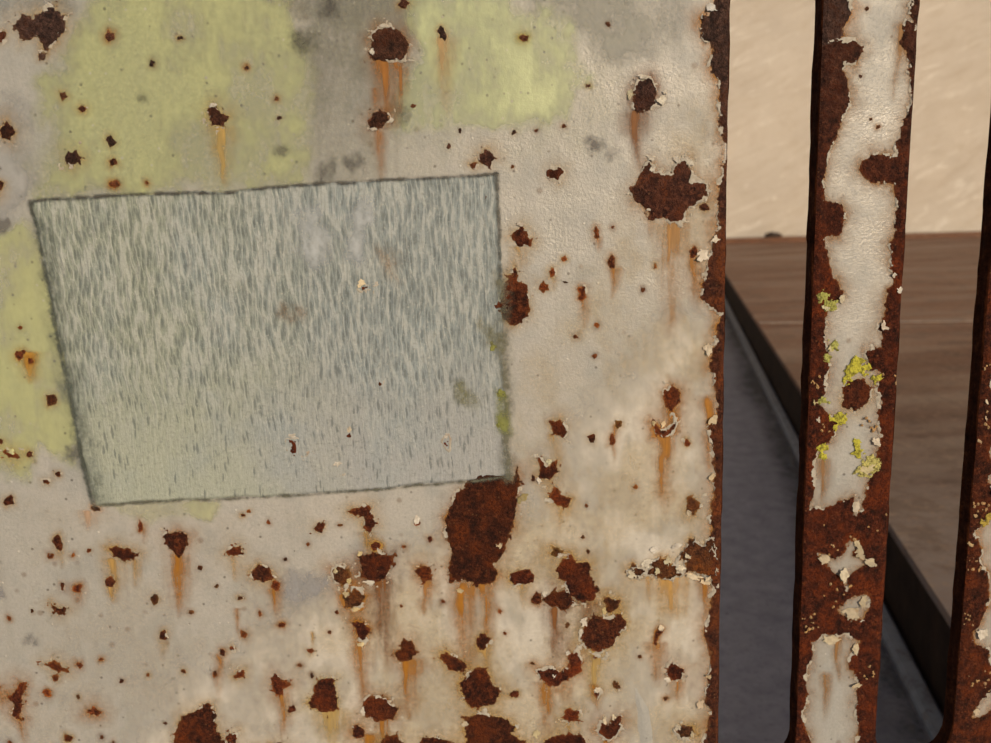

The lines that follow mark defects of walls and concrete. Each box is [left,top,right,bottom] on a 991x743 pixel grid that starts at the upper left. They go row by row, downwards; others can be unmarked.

corrosion [0,1,73,61]
corrosion [364,17,414,152]
corrosion [626,0,729,743]
corrosion [795,0,919,743]
corrosion [159,527,189,600]
corrosion [326,502,404,743]
corrosion [415,466,636,743]
corrosion [531,411,576,515]
peeling [624,537,719,610]
corrosion [949,265,991,743]
corrosion [170,703,242,743]
corrosion [263,667,339,732]